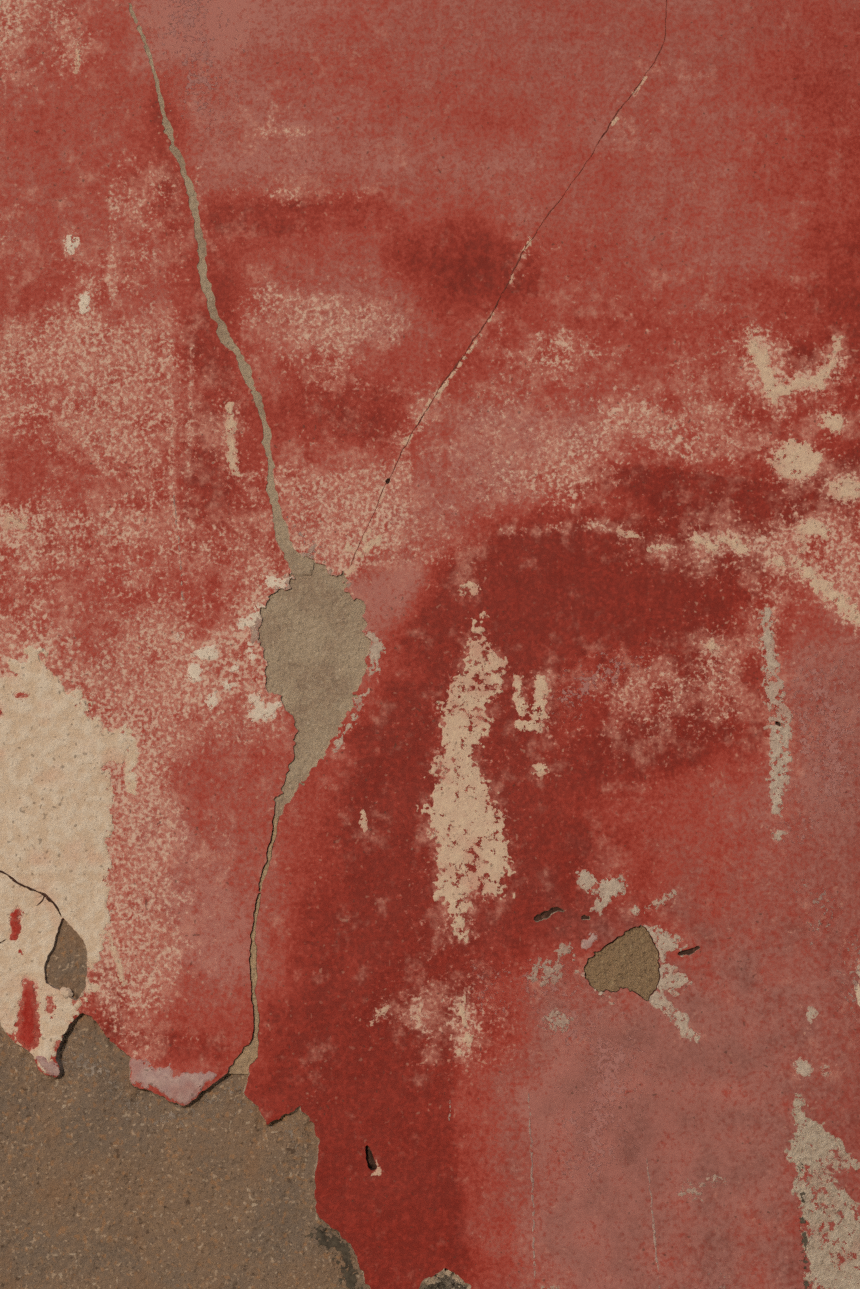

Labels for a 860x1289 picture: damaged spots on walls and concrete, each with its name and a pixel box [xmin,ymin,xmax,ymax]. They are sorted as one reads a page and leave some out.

crack [129,3,314,575]
crack [351,0,667,564]
crack [0,870,61,916]
spalling [0,645,370,1289]
crack [228,805,279,1074]
spalling [173,540,371,818]
peeling [416,611,516,944]
spalling [574,925,660,1005]
peeling [678,946,700,957]
spalling [419,1268,471,1289]
flaking render [784,1093,860,1289]